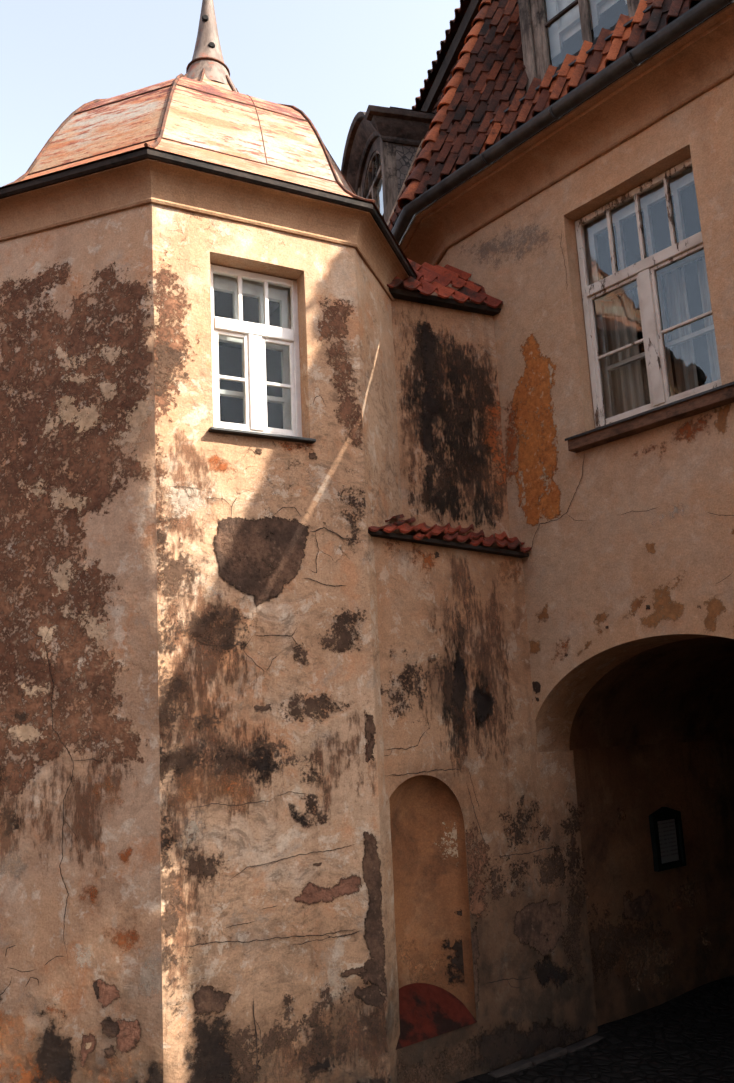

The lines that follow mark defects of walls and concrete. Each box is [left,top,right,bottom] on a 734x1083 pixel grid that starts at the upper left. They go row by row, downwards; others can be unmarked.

flaking render [0,250,200,800]
flaking render [213,516,310,607]
flaking render [317,298,363,450]
water stain [393,312,507,528]
flaking render [480,333,561,526]
crack [530,461,587,553]
water stain [380,555,515,771]
crack [0,609,101,1000]
water stain [31,1004,76,1083]
flaking render [79,979,141,1068]
water stain [135,1062,163,1083]
flaking render [295,831,387,1052]